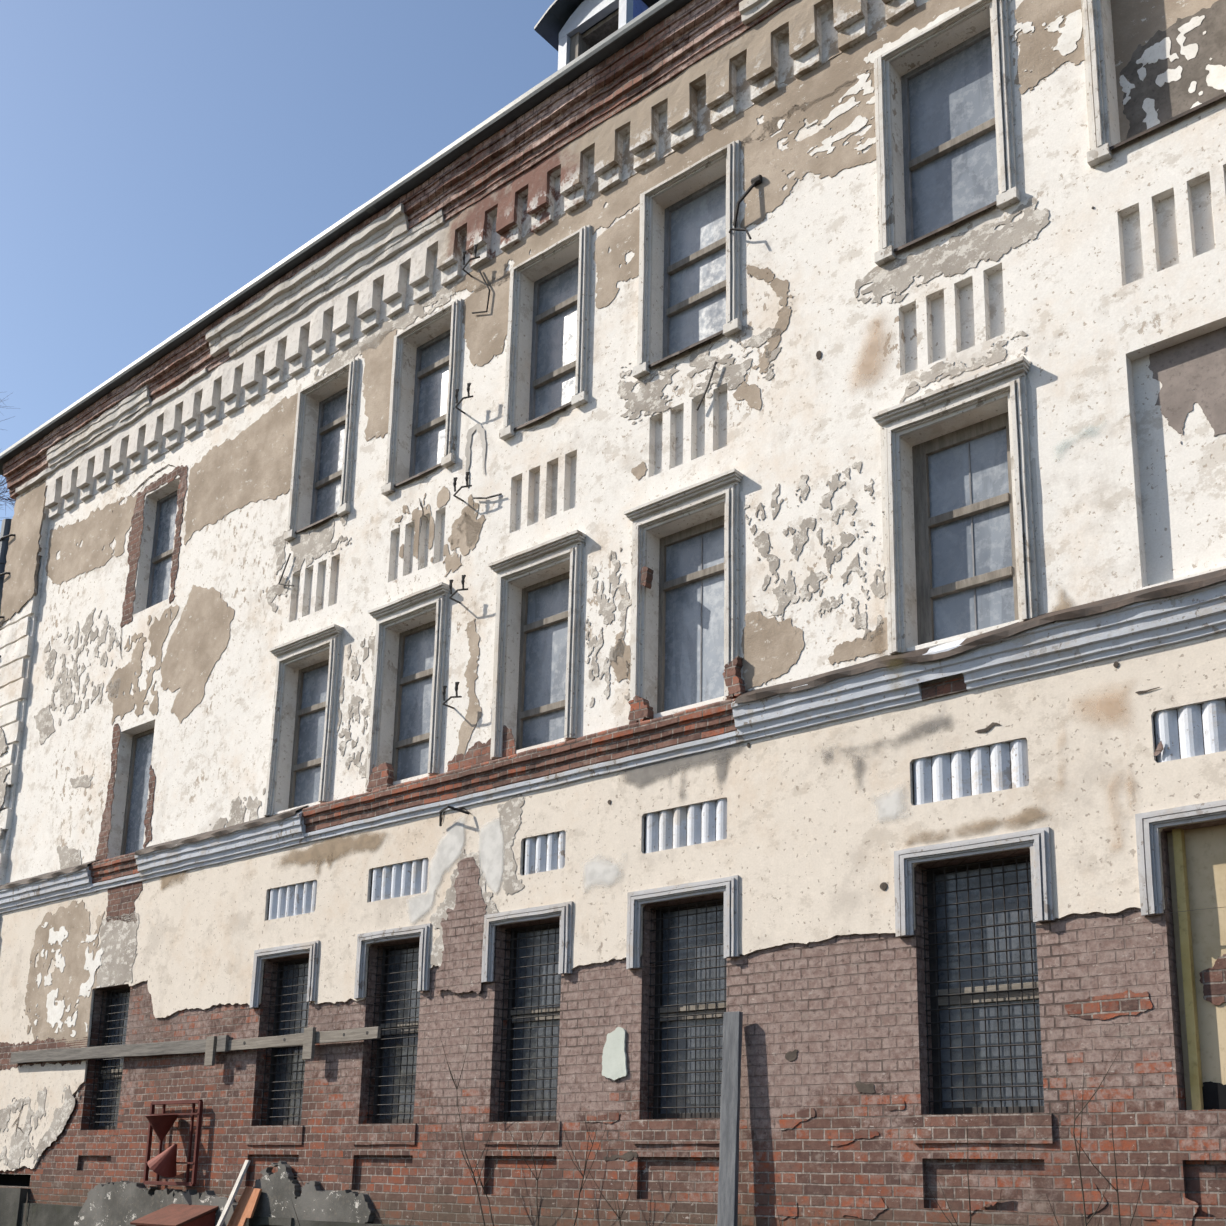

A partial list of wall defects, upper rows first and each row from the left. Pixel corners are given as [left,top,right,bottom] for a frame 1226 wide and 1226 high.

flaking render [1008,0,1085,94]
peeling [1119,0,1226,139]
flaking render [314,0,976,441]
peeling [854,198,1050,304]
flaking render [1148,326,1226,443]
flaking render [0,393,298,870]
flaking render [723,461,888,699]
flaking render [429,794,525,994]
flaking render [0,881,143,1070]
peeling [0,1085,79,1169]
flaking render [602,1027,628,1081]
spalling [1202,1081,1226,1110]